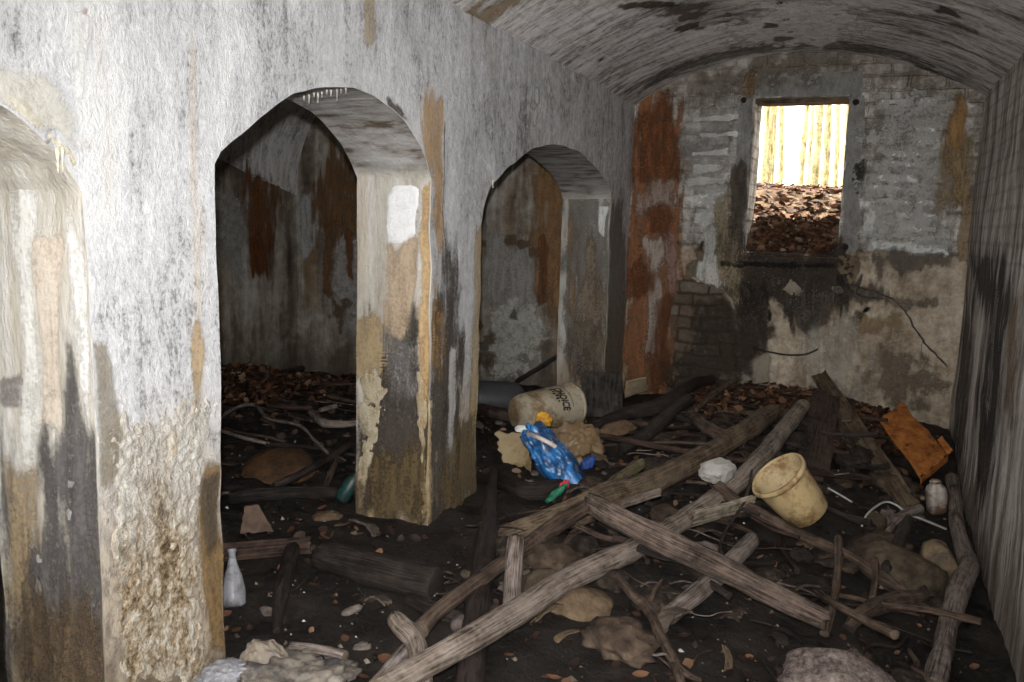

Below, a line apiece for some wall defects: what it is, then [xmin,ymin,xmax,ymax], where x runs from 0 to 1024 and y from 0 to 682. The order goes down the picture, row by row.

efflorescence [0,73,76,173]
water stain [0,189,120,682]
corrosion [234,161,281,279]
corrosion [311,143,357,297]
peeling [357,371,388,486]
corrosion [418,92,446,401]
corrosion [526,166,576,332]
corrosion [622,89,696,394]
flaking render [661,248,776,391]
water stain [696,159,1011,591]
water stain [198,463,225,651]